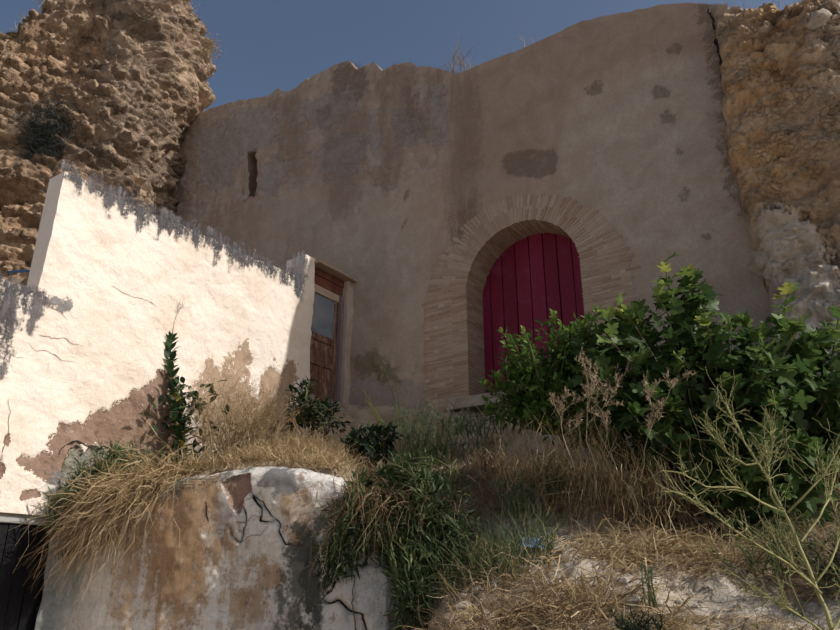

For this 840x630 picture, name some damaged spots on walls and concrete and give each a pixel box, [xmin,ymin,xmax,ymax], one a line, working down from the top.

crack [707,8,724,96]
damp [60,160,309,300]
damp [0,273,73,380]
spalling [16,338,299,523]
crack [205,493,299,545]
crack [322,574,367,630]